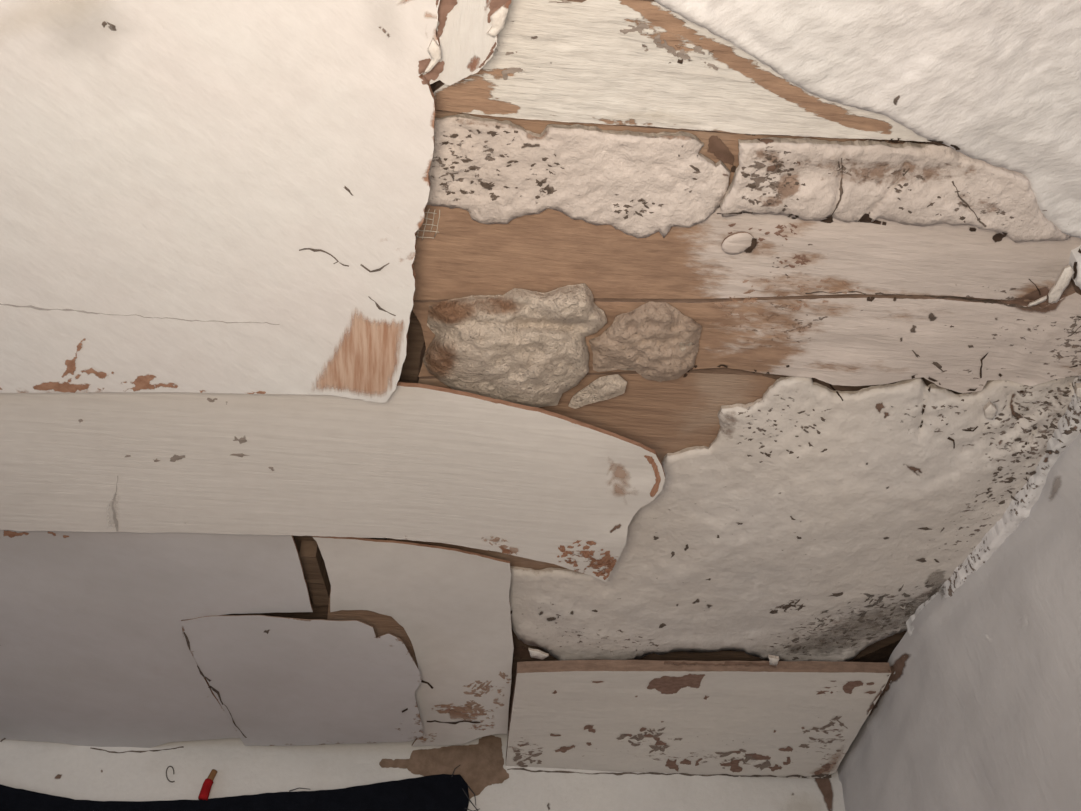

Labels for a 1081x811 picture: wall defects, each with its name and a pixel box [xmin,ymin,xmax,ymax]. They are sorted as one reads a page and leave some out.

spalling [440,125,564,201]
spalling [708,136,806,205]
spalling [858,213,887,225]
peeling [1028,265,1075,307]
peeling [33,339,114,393]
peeling [123,375,178,391]
peeling [317,313,403,395]
spalling [967,387,1081,504]
crack [183,632,247,738]
peeling [647,654,779,700]
peeling [617,721,702,771]
peeling [715,716,848,775]